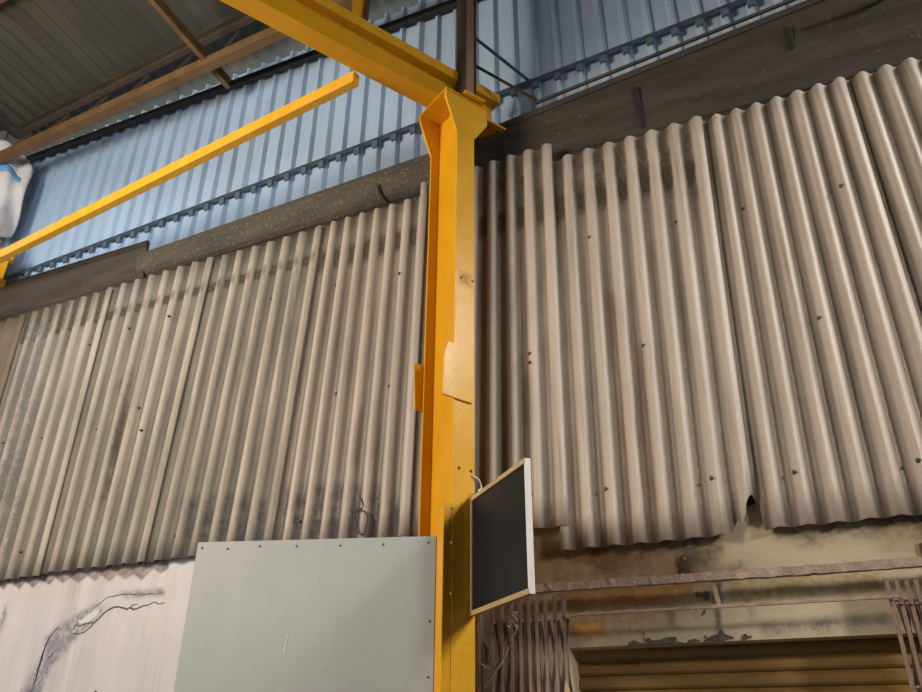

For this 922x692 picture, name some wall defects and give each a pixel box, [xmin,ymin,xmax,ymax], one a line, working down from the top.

crack [31,592,163,692]
spalling [627,629,752,646]